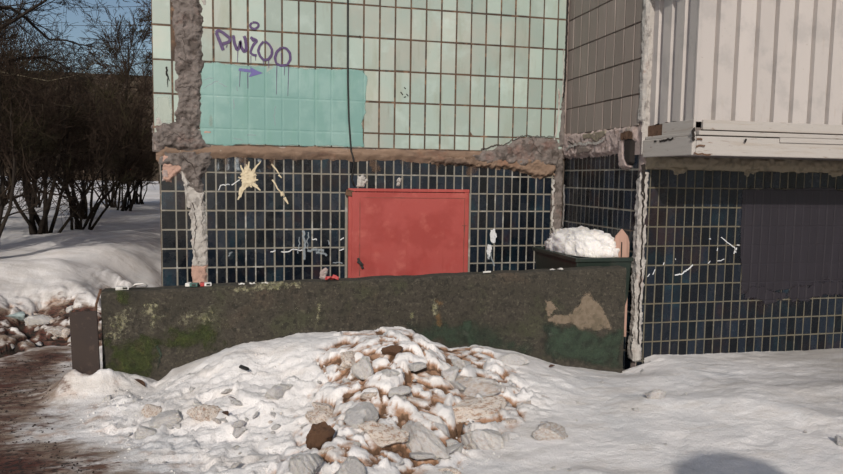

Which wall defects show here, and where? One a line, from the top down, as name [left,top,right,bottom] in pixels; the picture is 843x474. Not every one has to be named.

peeling [158,152,212,285]
peeling [428,0,843,363]